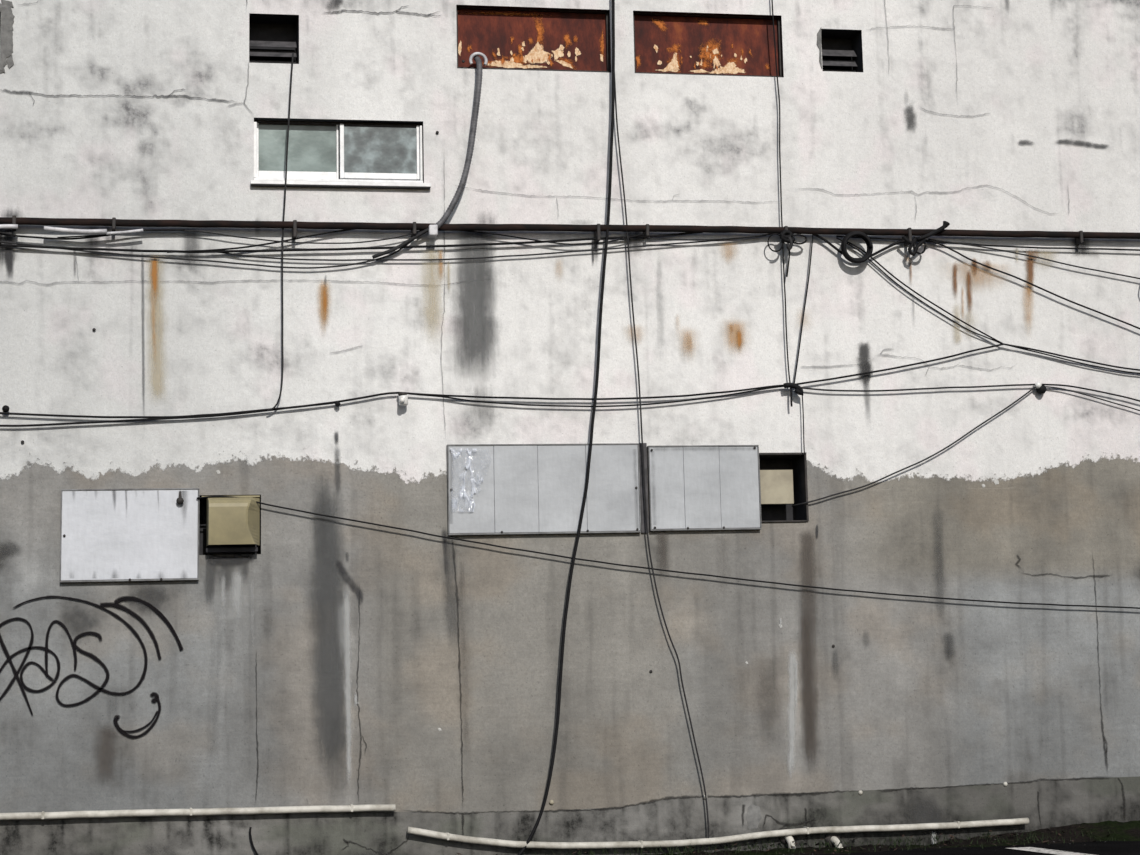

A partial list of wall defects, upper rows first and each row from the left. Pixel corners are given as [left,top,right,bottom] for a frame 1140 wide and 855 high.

crack [3,85,248,104]
rust [151,258,160,390]
rust [320,284,328,320]
water stain [460,231,492,362]
water stain [859,343,871,381]
rust [953,259,989,307]
rust [1027,252,1036,299]
water stain [316,501,362,771]
flaking render [0,451,1140,821]
water stain [789,526,818,769]
crack [885,555,1125,823]